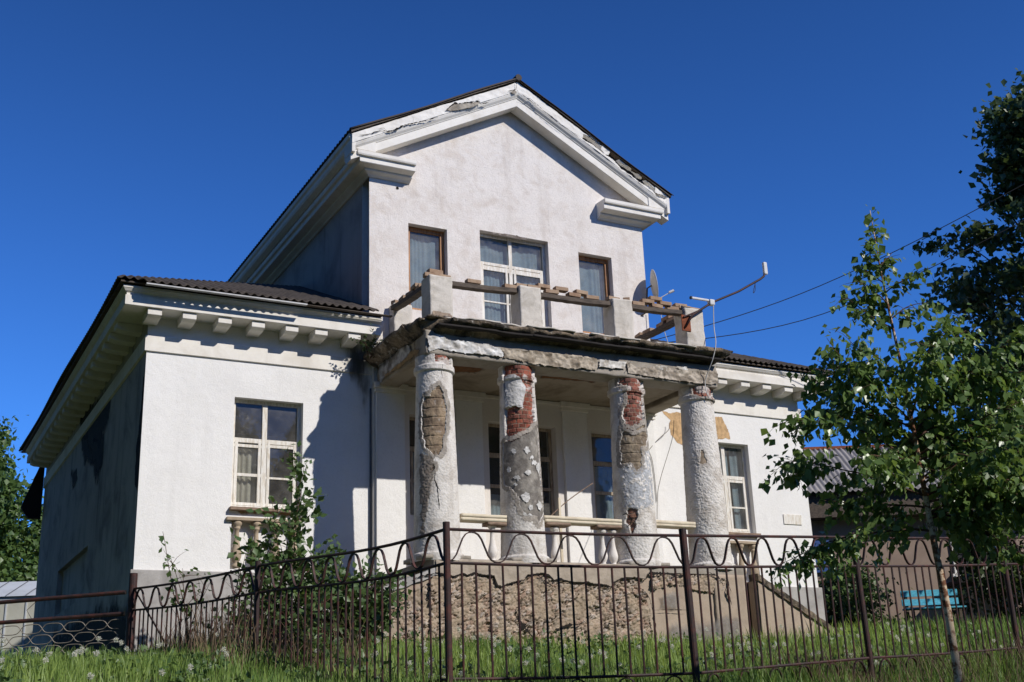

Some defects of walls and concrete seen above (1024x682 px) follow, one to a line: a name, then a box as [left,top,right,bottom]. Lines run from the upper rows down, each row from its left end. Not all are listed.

flaking render [446,100,488,111]
flaking render [418,381,451,535]
peeling [427,334,718,533]
peeling [715,417,730,439]